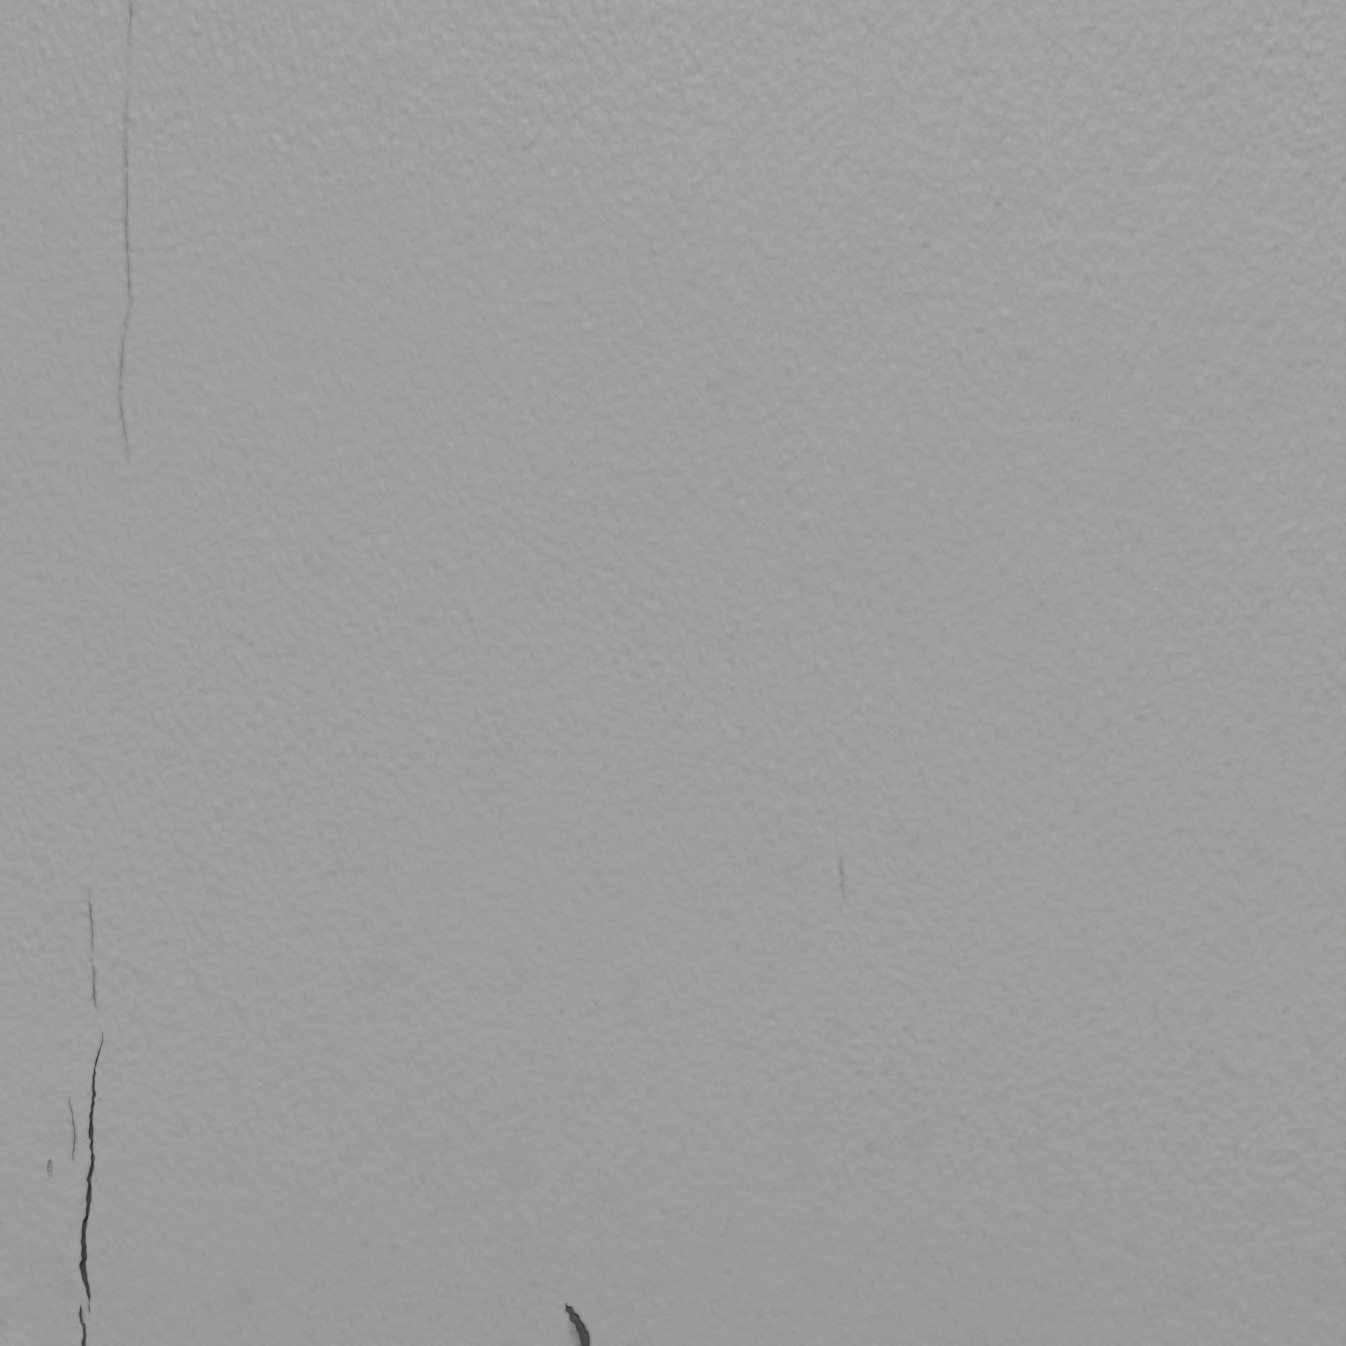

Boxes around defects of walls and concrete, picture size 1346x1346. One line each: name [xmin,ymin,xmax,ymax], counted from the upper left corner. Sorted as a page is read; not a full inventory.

crack [62,878,110,1346]